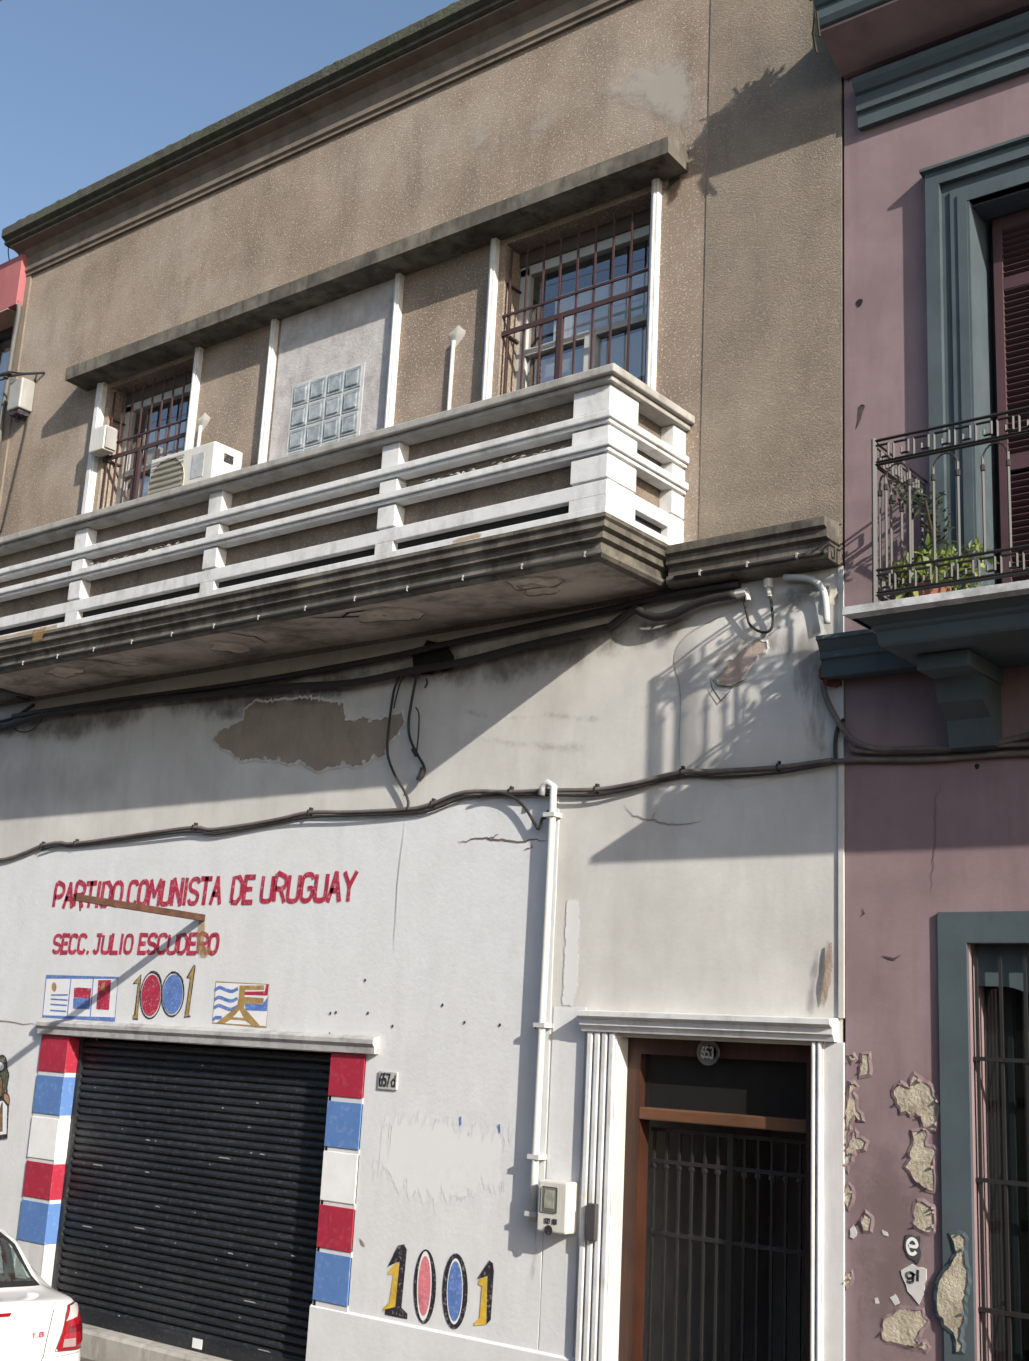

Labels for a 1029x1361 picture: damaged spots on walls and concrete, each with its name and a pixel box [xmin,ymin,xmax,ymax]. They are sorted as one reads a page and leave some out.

spalling [710,637,770,702]
peeling [212,695,407,774]
crack [458,834,546,850]
crack [626,808,703,825]
peeling [844,1051,875,1234]
peeling [879,1071,972,1354]